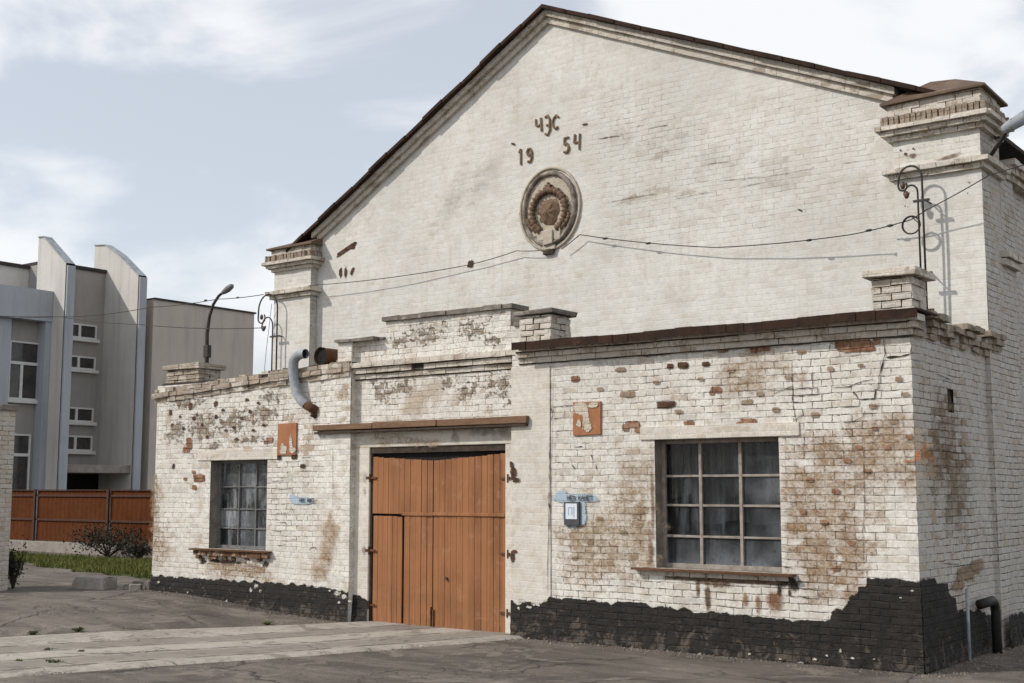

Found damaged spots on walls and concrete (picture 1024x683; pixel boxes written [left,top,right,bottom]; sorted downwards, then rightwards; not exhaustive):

peeling [390,315,503,349]
peeling [155,388,305,468]
peeling [367,377,415,406]
peeling [441,370,511,407]
crack [767,338,913,570]
damp [665,393,972,609]